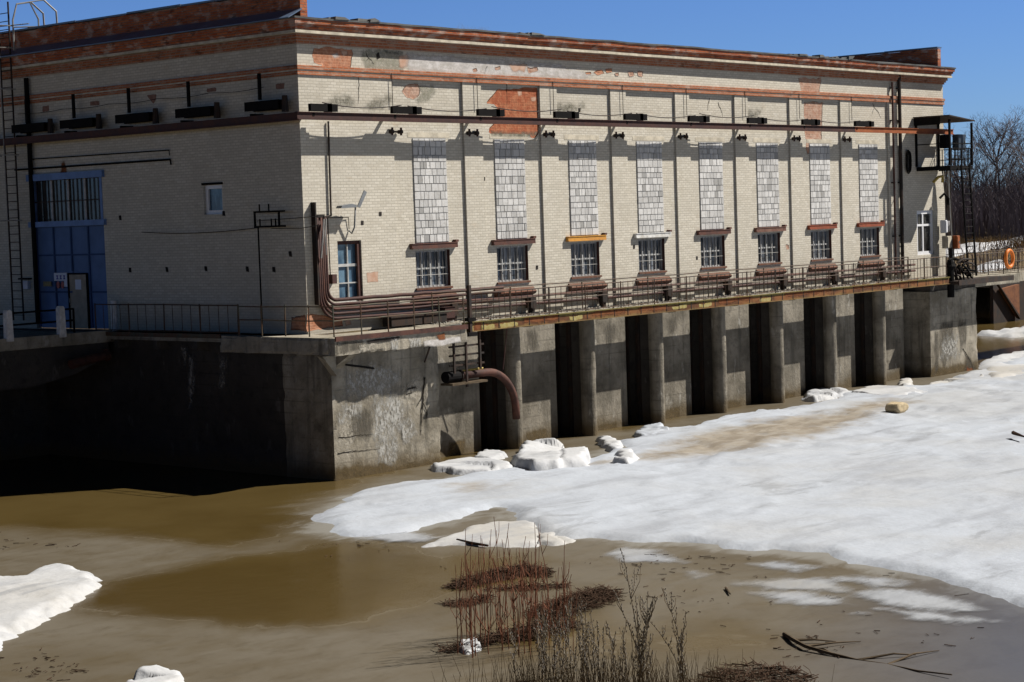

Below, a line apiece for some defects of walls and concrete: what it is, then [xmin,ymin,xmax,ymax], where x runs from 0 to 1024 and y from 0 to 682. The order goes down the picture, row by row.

spalling [312,47,403,70]
spalling [487,87,539,138]
spalling [798,77,823,154]
damp [336,367,465,481]